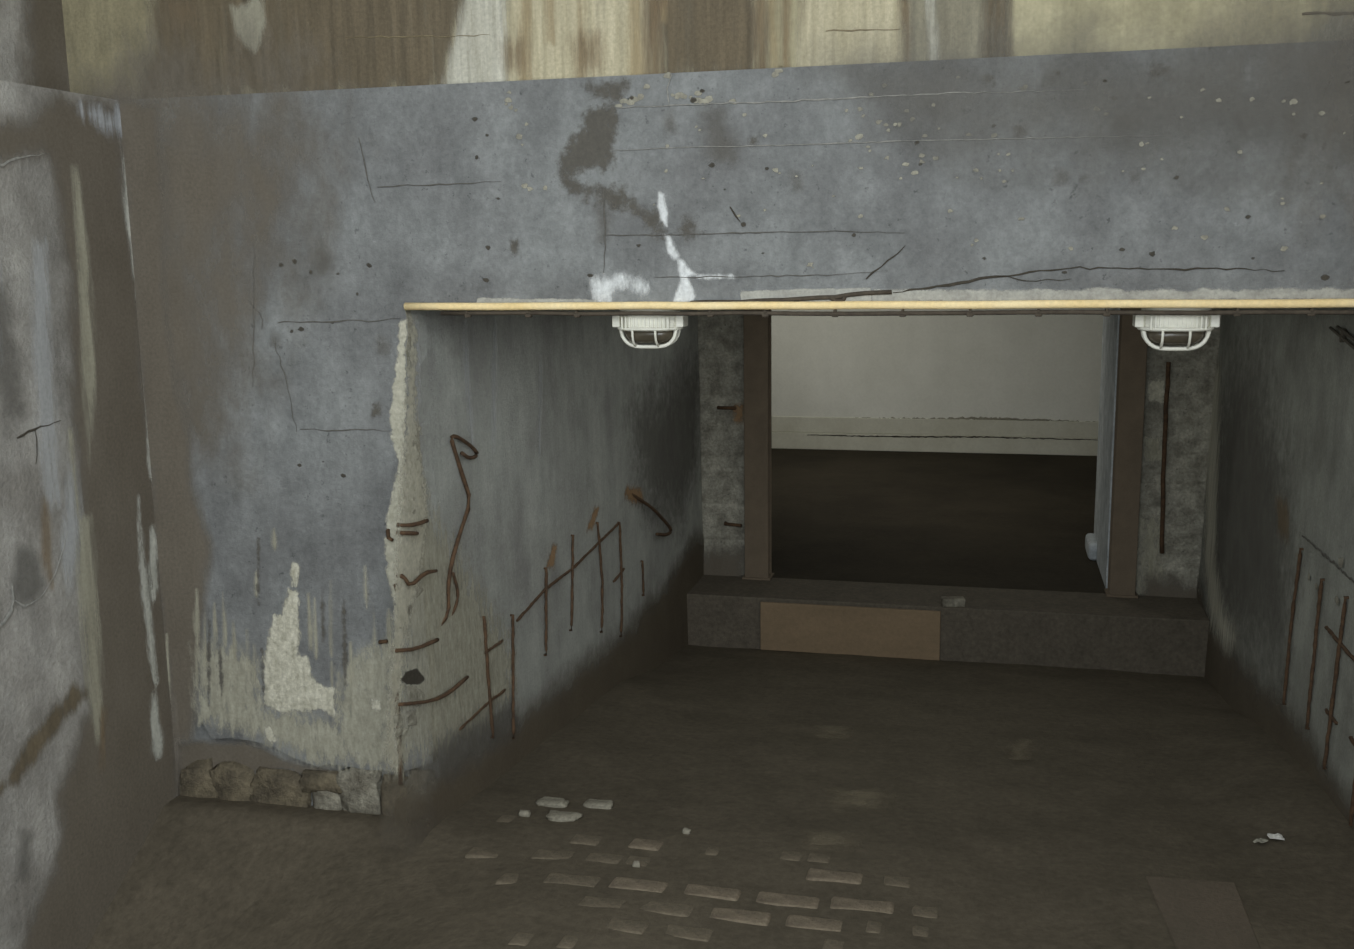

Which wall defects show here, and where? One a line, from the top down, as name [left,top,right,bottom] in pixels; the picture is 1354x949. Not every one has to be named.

crack [866,246,1285,293]
peeling [871,275,1354,301]
flaking render [191,320,479,786]
damp [0,0,766,949]
spalling [459,522,625,739]
peeling [1147,378,1165,403]
spalling [1282,548,1304,705]
spalling [1305,578,1354,770]